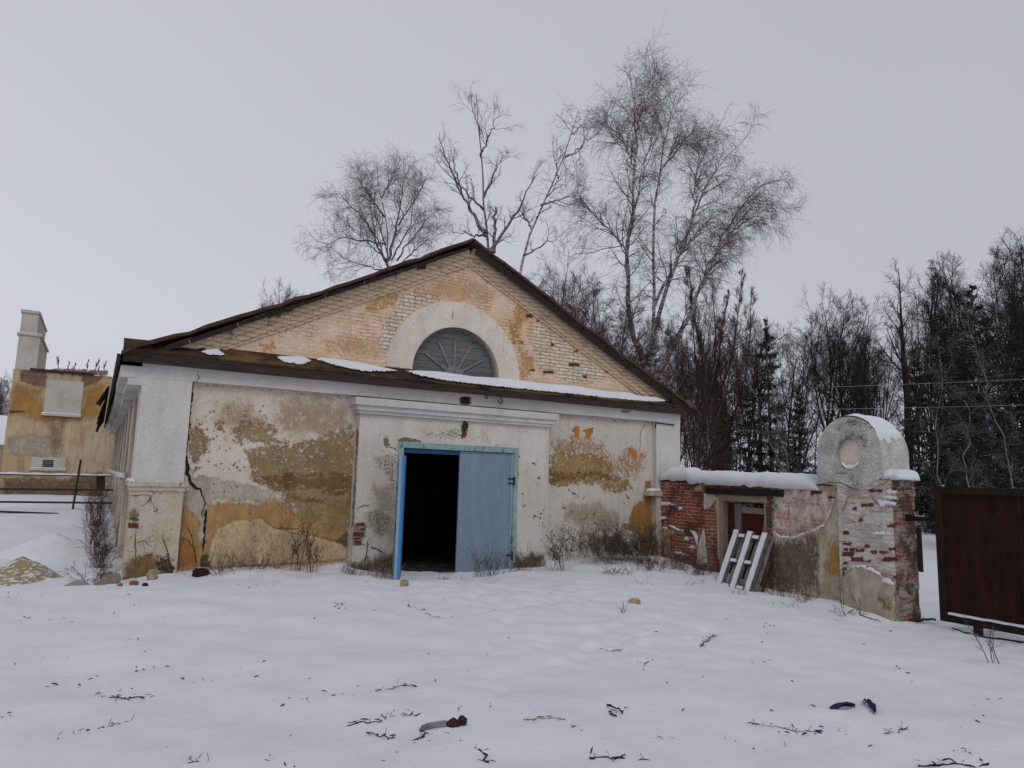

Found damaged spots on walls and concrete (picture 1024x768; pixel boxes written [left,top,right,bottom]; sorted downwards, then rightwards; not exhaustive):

peeling [520,314,609,385]
damp [13,385,102,445]
crack [128,375,208,573]
peeling [188,401,390,547]
peeling [532,426,647,504]
flaking render [767,489,835,537]
flaking render [842,531,898,575]